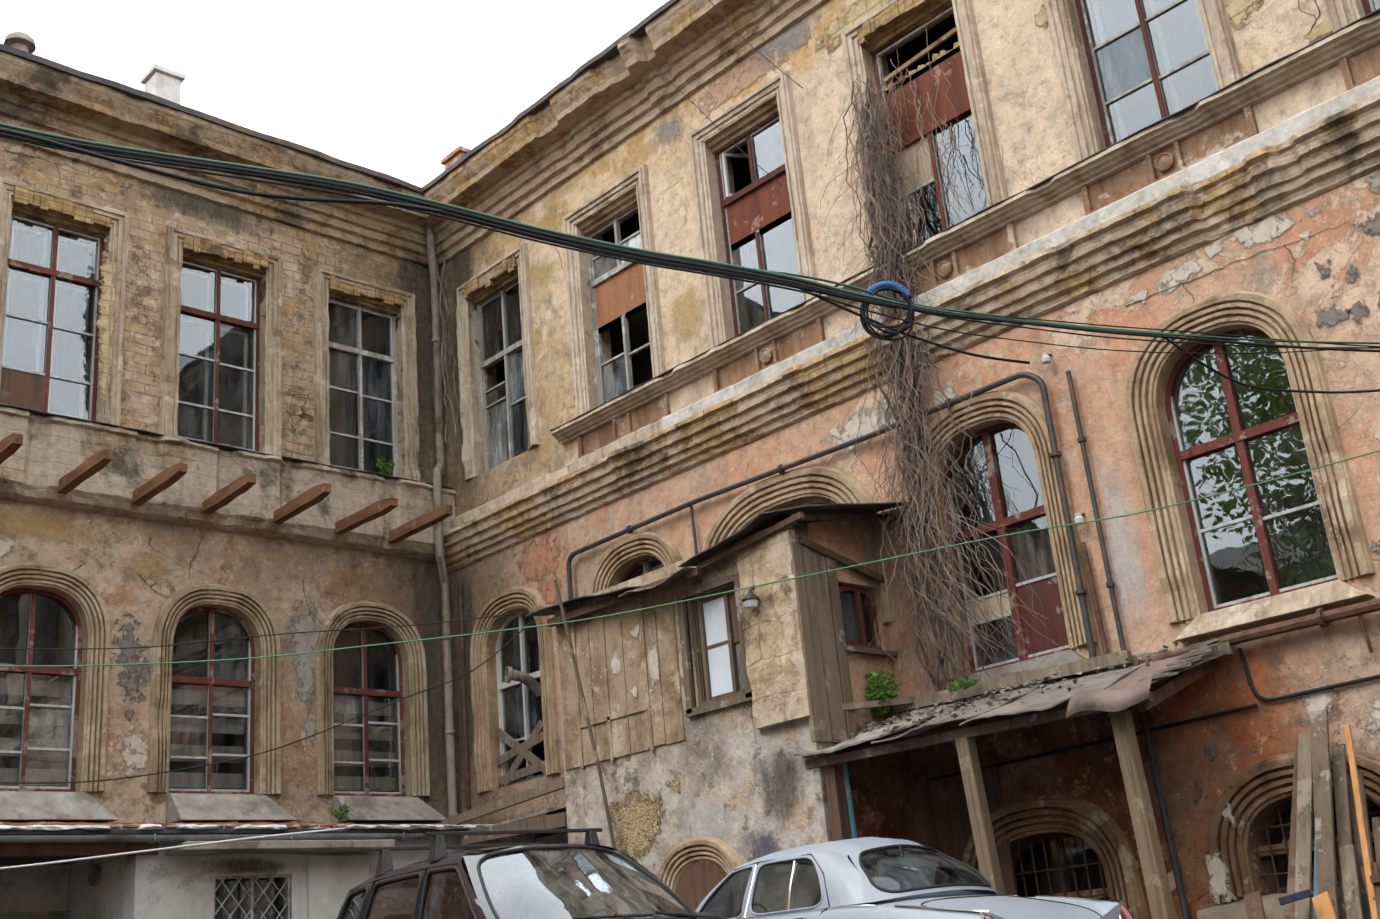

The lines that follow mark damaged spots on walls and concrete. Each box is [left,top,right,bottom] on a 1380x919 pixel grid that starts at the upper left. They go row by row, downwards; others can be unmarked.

flaking render [1224,0,1264,32]
flaking render [1362,174,1380,194]
flaking render [1350,210,1380,237]
flaking render [1314,258,1380,329]
flaking render [111,611,151,777]
flaking render [1298,678,1333,720]
flaking render [1361,684,1380,752]
flaking render [605,778,681,861]
flaking render [1221,802,1235,824]
flaking render [1204,849,1238,904]